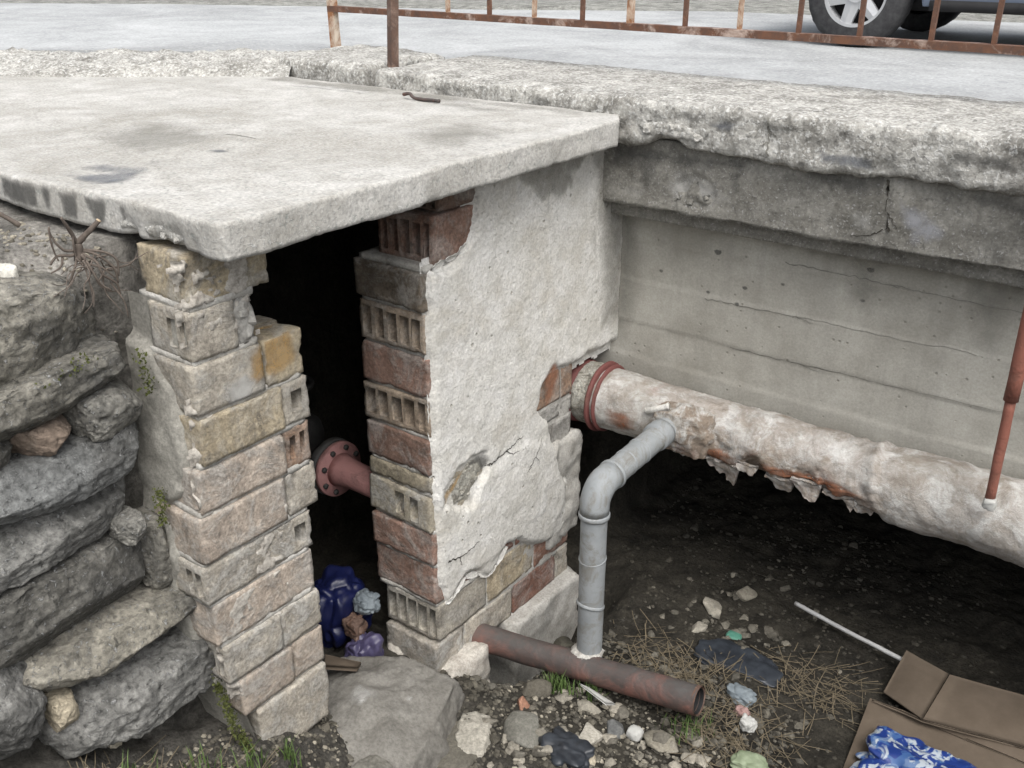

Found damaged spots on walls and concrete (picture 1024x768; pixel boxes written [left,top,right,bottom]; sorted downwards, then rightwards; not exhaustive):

water stain [82,168,132,182]
crack [852,179,897,237]
crack [485,437,543,473]
spalling [449,460,481,504]
peeling [445,546,508,605]